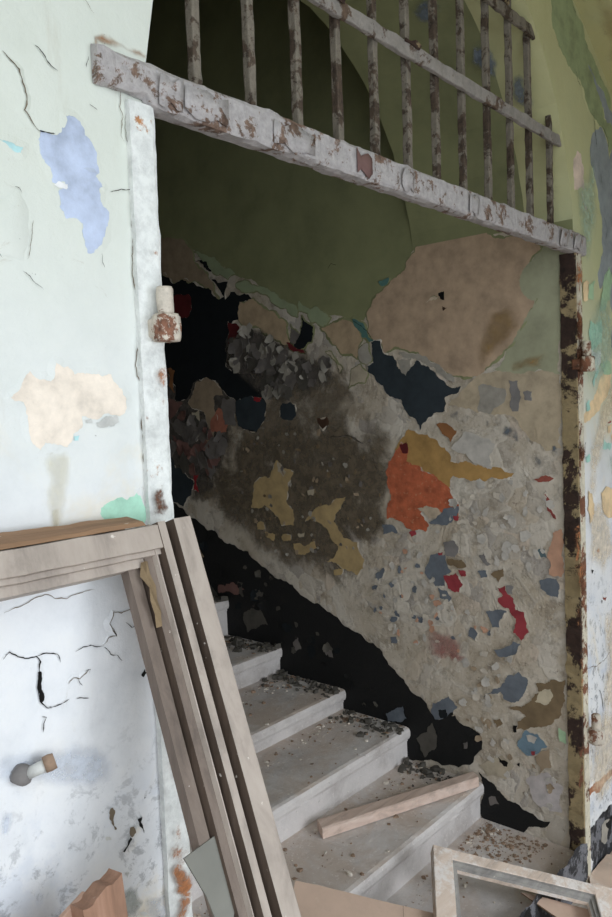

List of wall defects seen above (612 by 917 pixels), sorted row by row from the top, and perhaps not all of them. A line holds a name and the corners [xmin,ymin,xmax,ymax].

crack [3,51,55,134]
peeling [33,107,111,258]
peeling [3,356,132,454]
damp [166,331,388,581]
peeling [588,486,612,523]
crack [2,606,134,731]